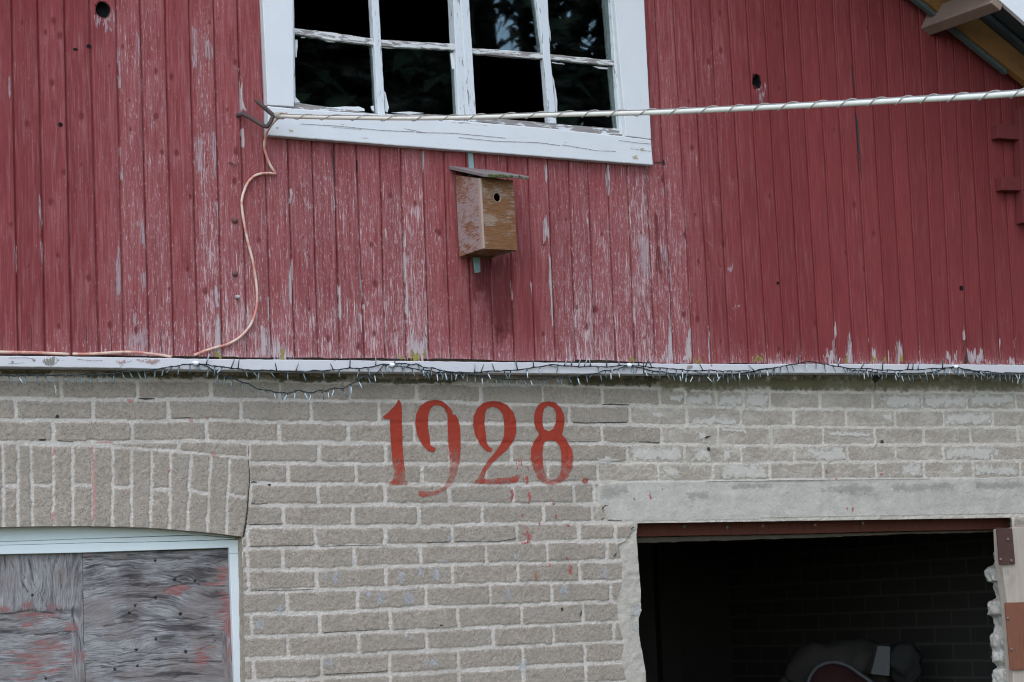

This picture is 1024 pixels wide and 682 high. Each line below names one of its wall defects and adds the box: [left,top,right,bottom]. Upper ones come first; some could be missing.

peeling [192,26,213,69]
peeling [238,68,246,113]
peeling [194,131,217,174]
peeling [543,217,554,327]
peeling [638,234,650,279]
peeling [403,233,428,361]
peeling [658,246,693,369]
peeling [128,313,148,356]
peeling [822,323,853,364]
peeling [868,339,903,364]
peeling [946,330,984,364]